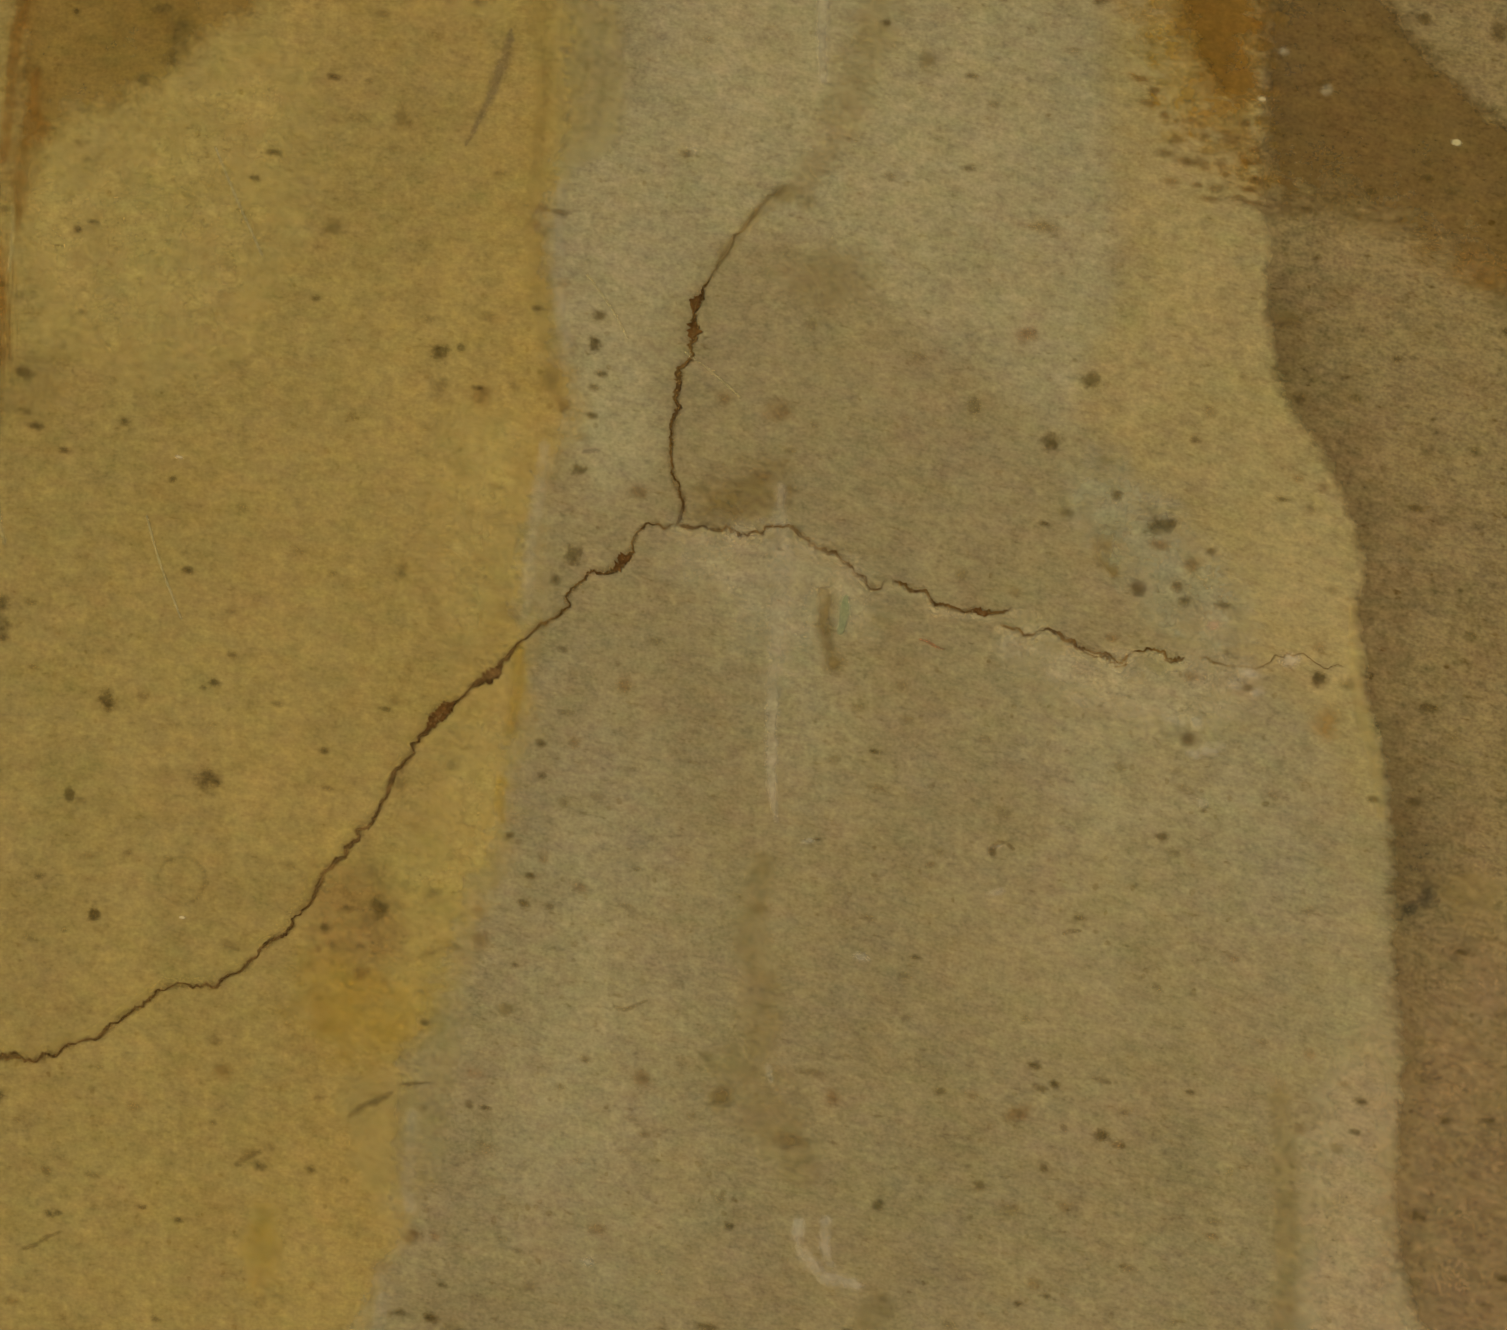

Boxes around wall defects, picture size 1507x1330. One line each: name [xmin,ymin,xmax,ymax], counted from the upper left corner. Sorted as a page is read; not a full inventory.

rust [1144,0,1269,180]
crack [0,188,1342,1063]
water stain [1257,0,1507,1330]